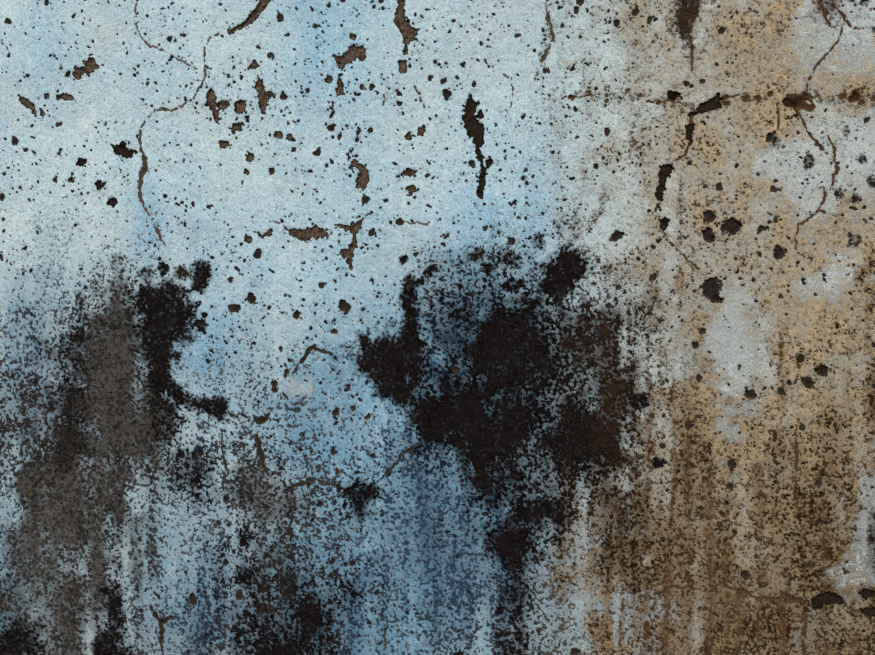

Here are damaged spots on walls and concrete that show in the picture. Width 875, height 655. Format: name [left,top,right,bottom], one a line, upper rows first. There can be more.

crack [687,37,695,72]
crack [561,88,698,167]
crack [720,0,875,250]
corrosion [558,189,609,241]
crack [664,233,700,270]
corrosion [575,0,875,655]
damp [0,232,665,655]